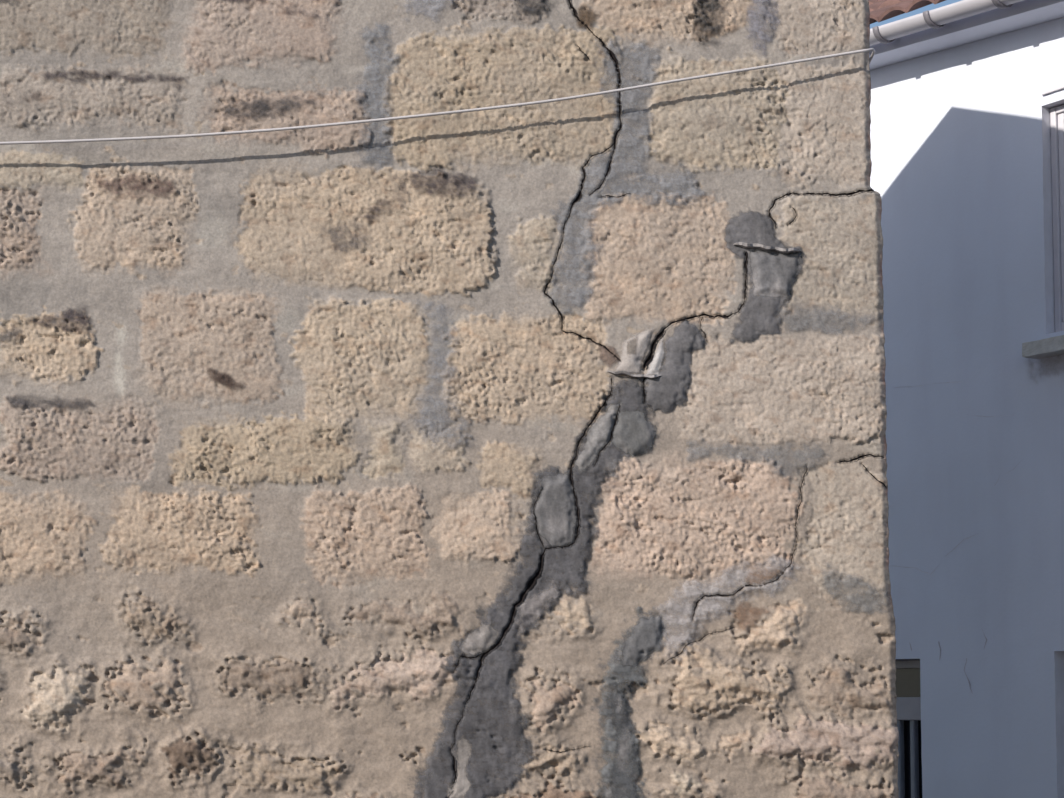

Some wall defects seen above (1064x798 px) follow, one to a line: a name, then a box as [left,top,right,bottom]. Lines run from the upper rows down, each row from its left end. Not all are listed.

crack [768,189,874,229]
crack [448,0,747,797]
crack [662,468,807,665]
crack [838,454,886,487]